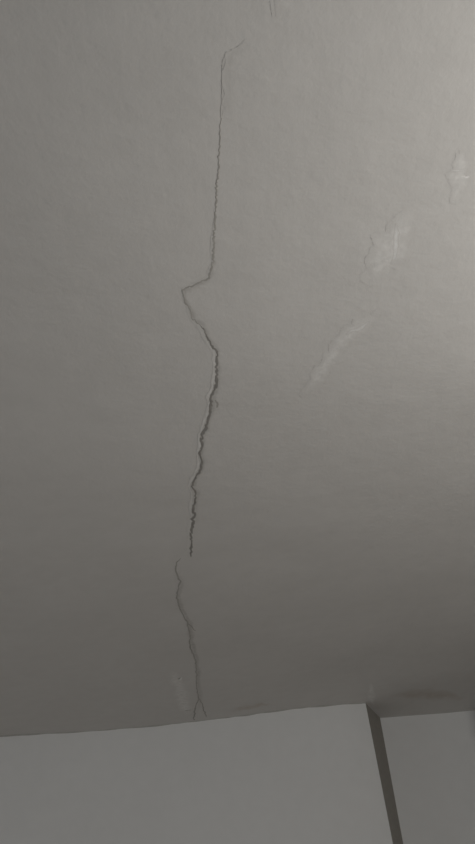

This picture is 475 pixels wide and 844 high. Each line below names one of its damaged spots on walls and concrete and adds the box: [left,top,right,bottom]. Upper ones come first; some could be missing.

crack [0,39,363,737]